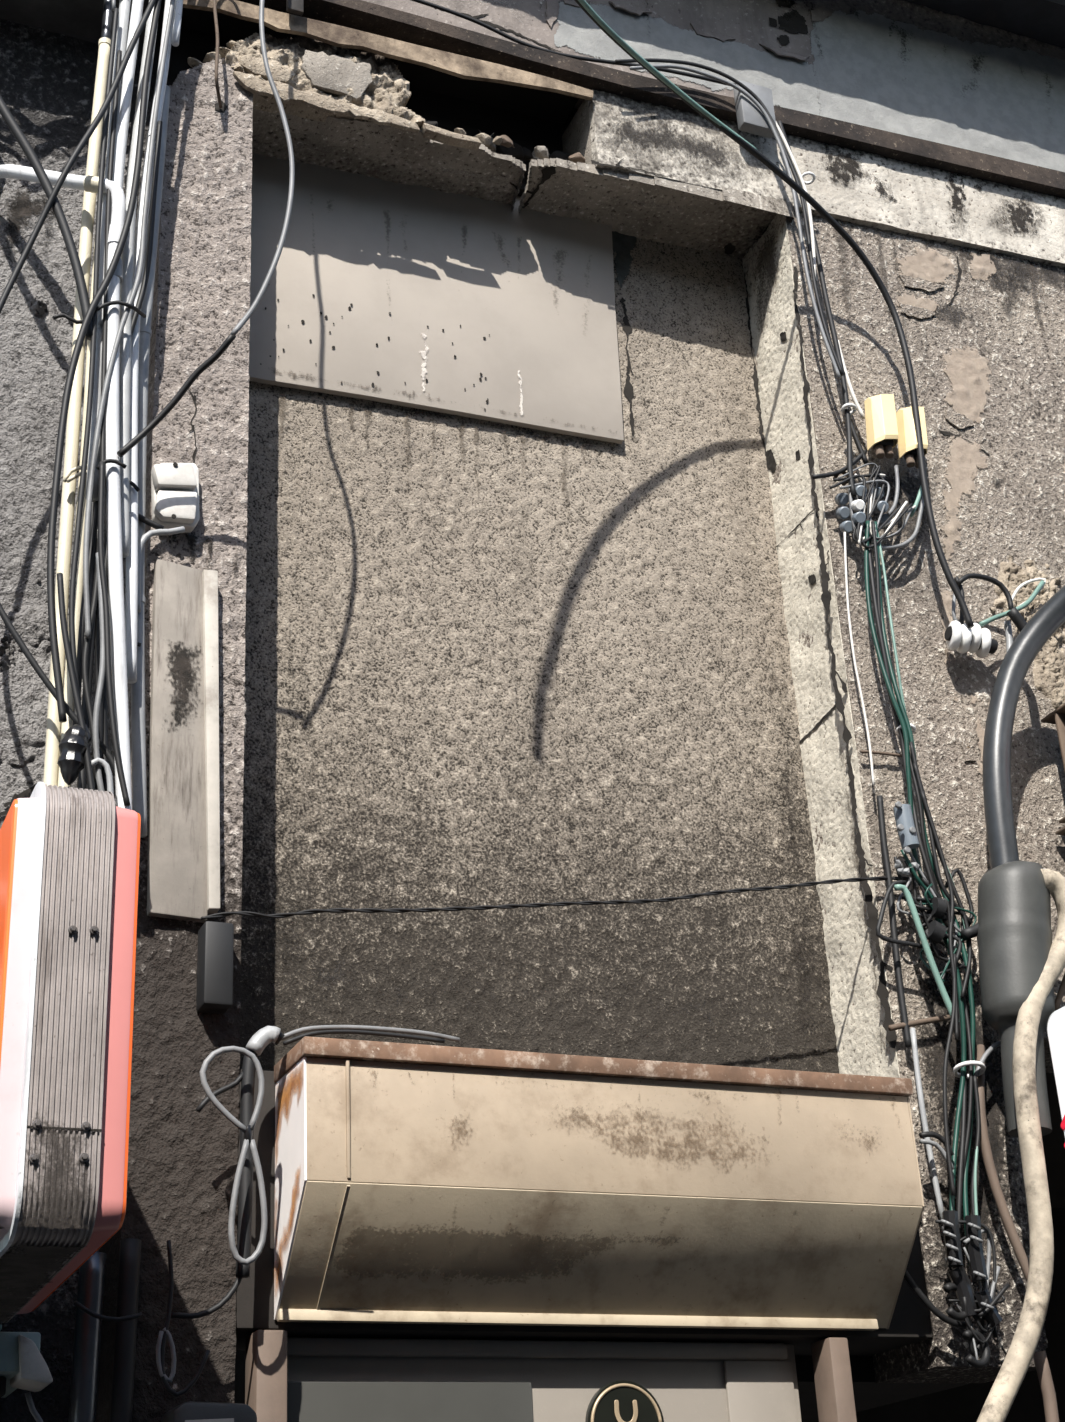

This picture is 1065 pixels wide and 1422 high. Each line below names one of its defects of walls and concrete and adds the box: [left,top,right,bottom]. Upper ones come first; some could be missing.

spalling [148,0,585,197]
damp [821,143,897,202]
damp [932,171,987,226]
damp [991,199,1044,235]
crack [620,298,635,435]
crack [744,272,766,451]
crack [777,266,897,1048]